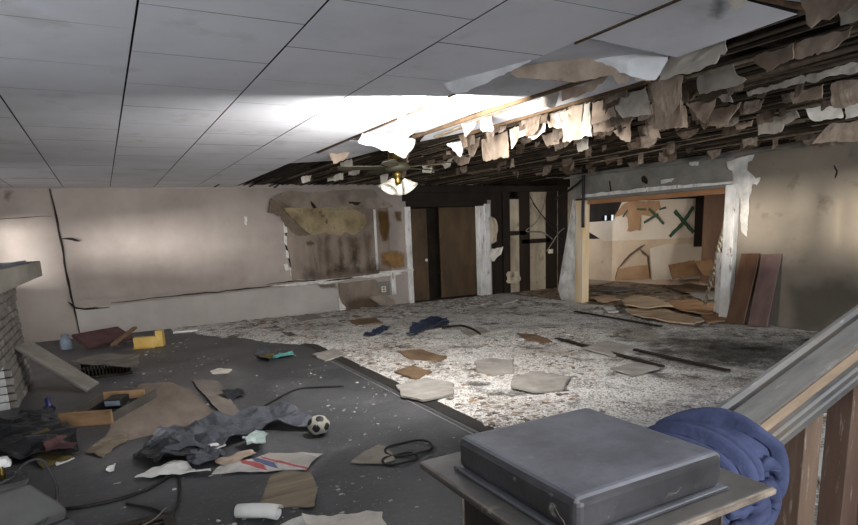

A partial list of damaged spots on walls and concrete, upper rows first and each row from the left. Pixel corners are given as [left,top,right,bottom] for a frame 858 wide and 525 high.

peeling [753,0,858,72]
peeling [327,152,360,182]
peeling [358,110,422,158]
peeling [422,40,858,173]
spalling [581,155,761,237]
crack [3,189,402,333]
flaking render [205,207,533,339]